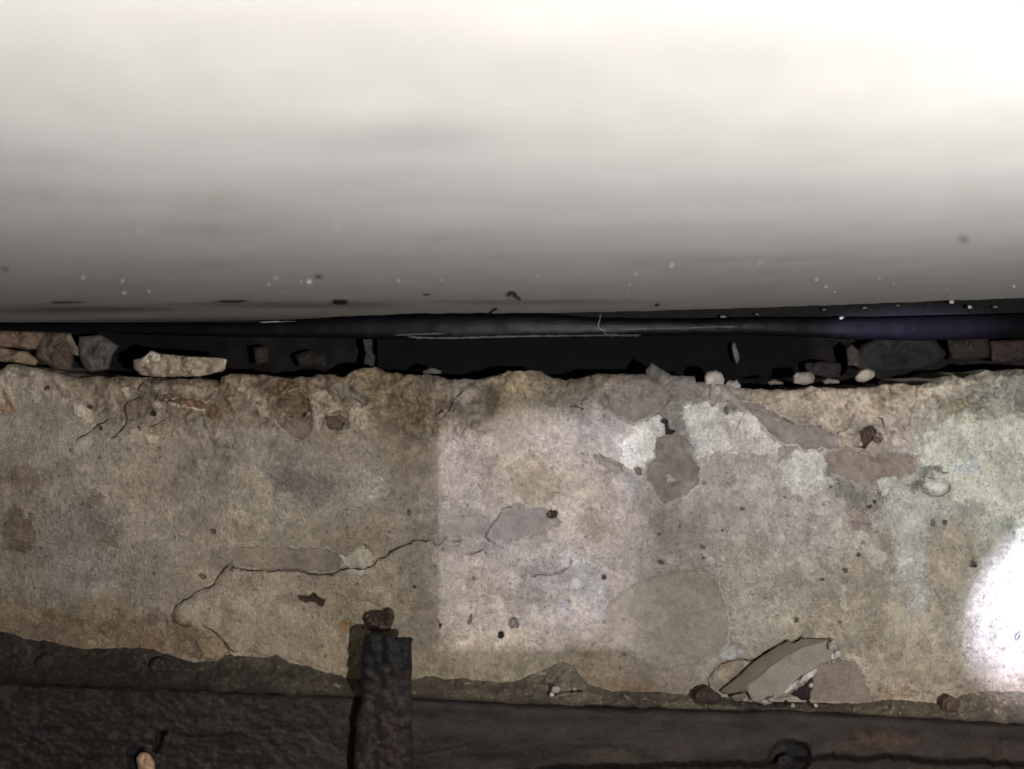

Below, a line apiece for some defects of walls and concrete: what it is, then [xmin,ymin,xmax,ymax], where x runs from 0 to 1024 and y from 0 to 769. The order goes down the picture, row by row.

crack [75,376,209,441]
spalling [593,434,702,506]
spalling [741,400,925,483]
spalling [489,502,563,541]
spalling [229,544,341,574]
crack [172,507,511,654]